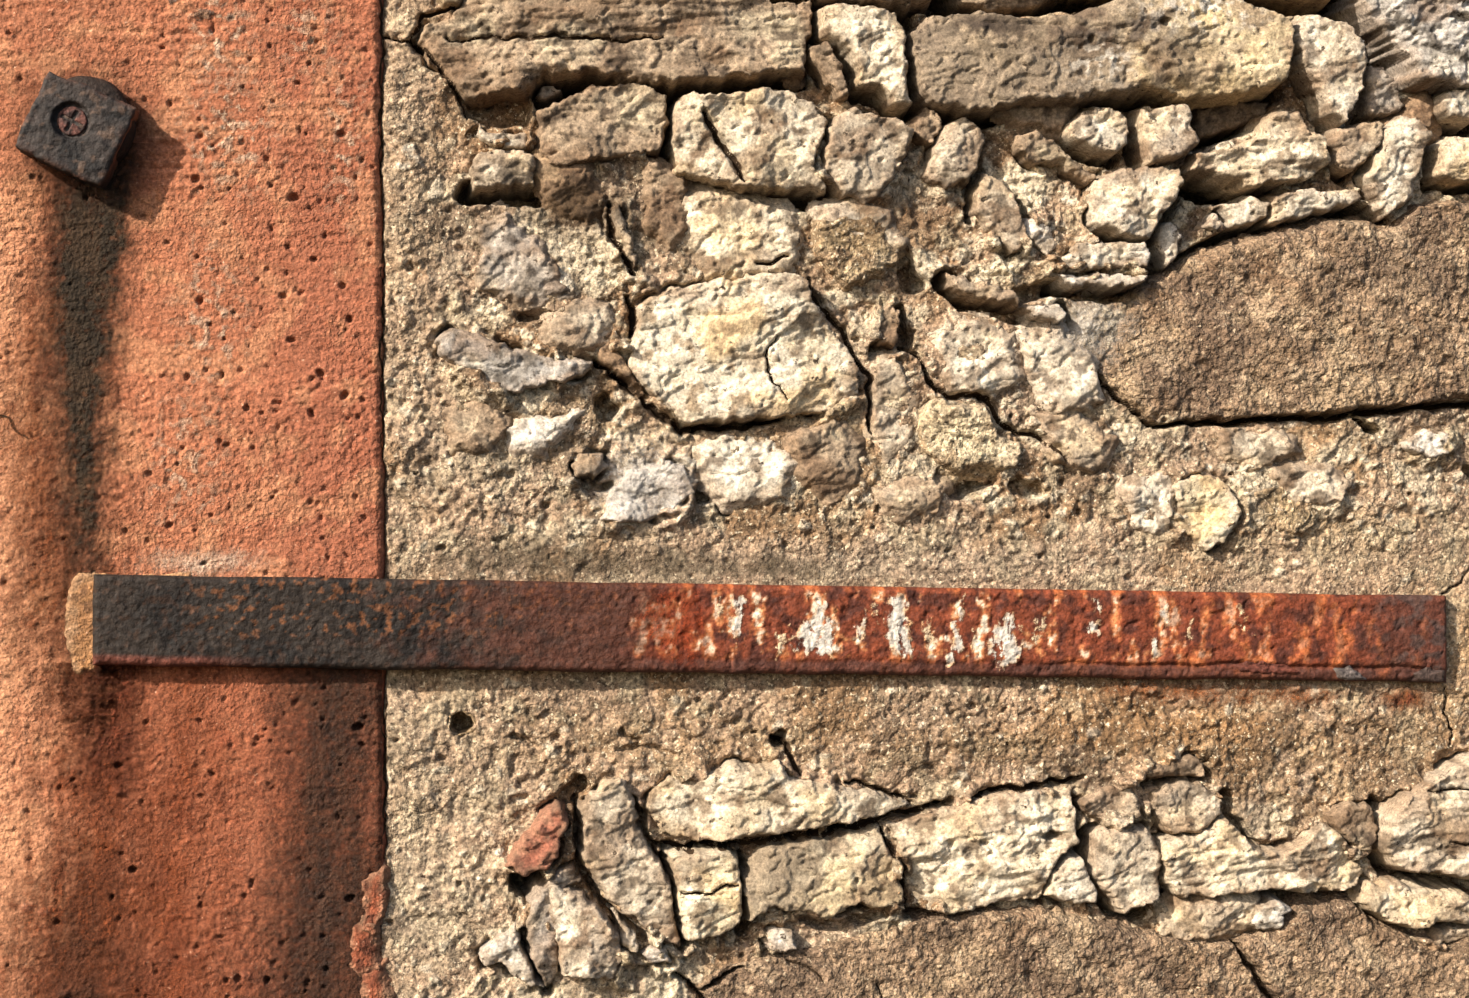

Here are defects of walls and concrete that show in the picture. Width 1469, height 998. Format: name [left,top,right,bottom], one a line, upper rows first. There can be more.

rust [1233,661,1301,700]
rust [1325,665,1367,694]
rust [1385,667,1445,707]
water stain [260,668,382,998]
spalling [348,859,397,998]
crack [674,965,741,998]
crack [1229,939,1273,998]